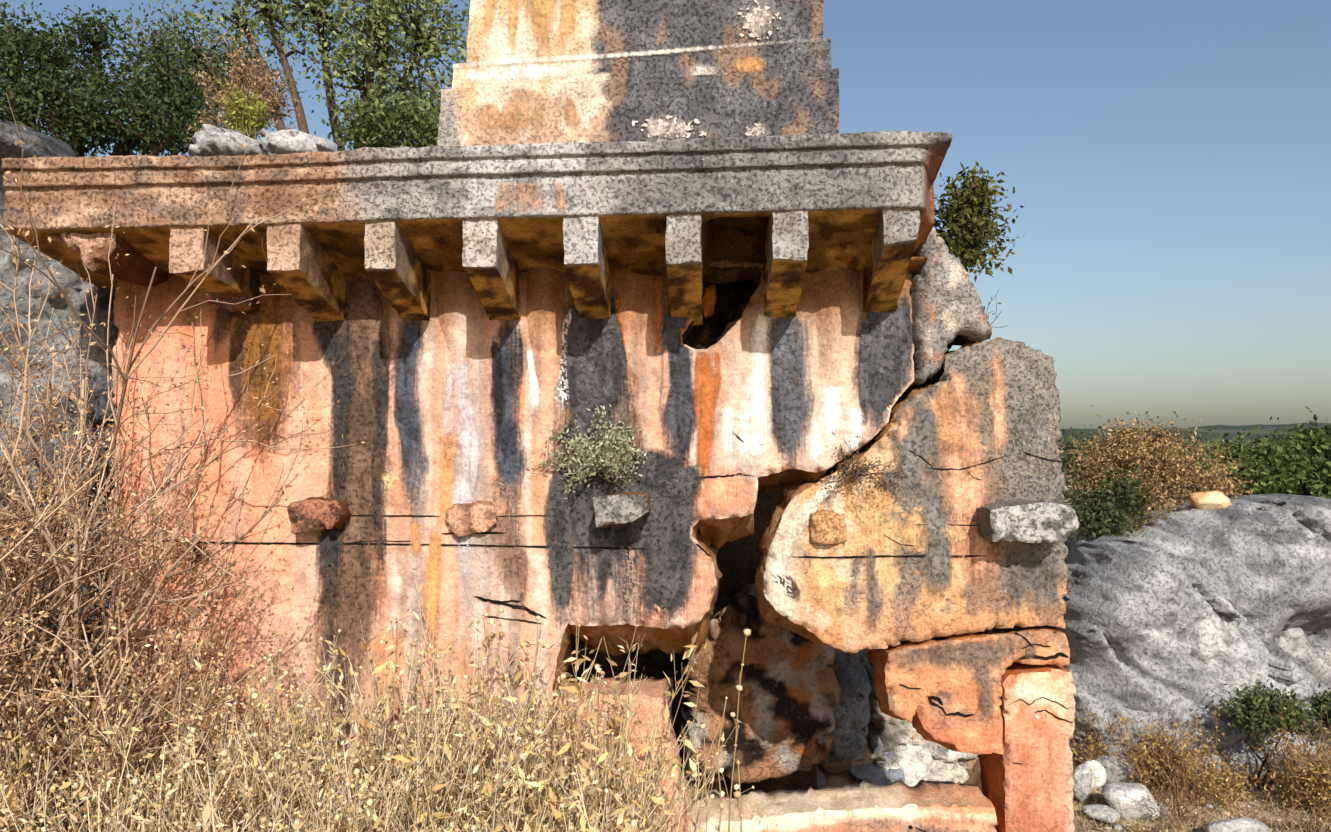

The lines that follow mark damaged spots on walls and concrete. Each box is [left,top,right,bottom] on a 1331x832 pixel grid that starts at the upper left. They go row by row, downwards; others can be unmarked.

peeling [702,284,717,320]
crack [894,336,957,405]
crack [811,434,877,480]
crack [907,449,1062,480]
corrosion [410,434,455,640]
crack [792,524,983,558]
spalling [774,575,800,599]
crack [867,625,1069,660]
crack [899,684,974,717]
crack [1009,697,1073,723]